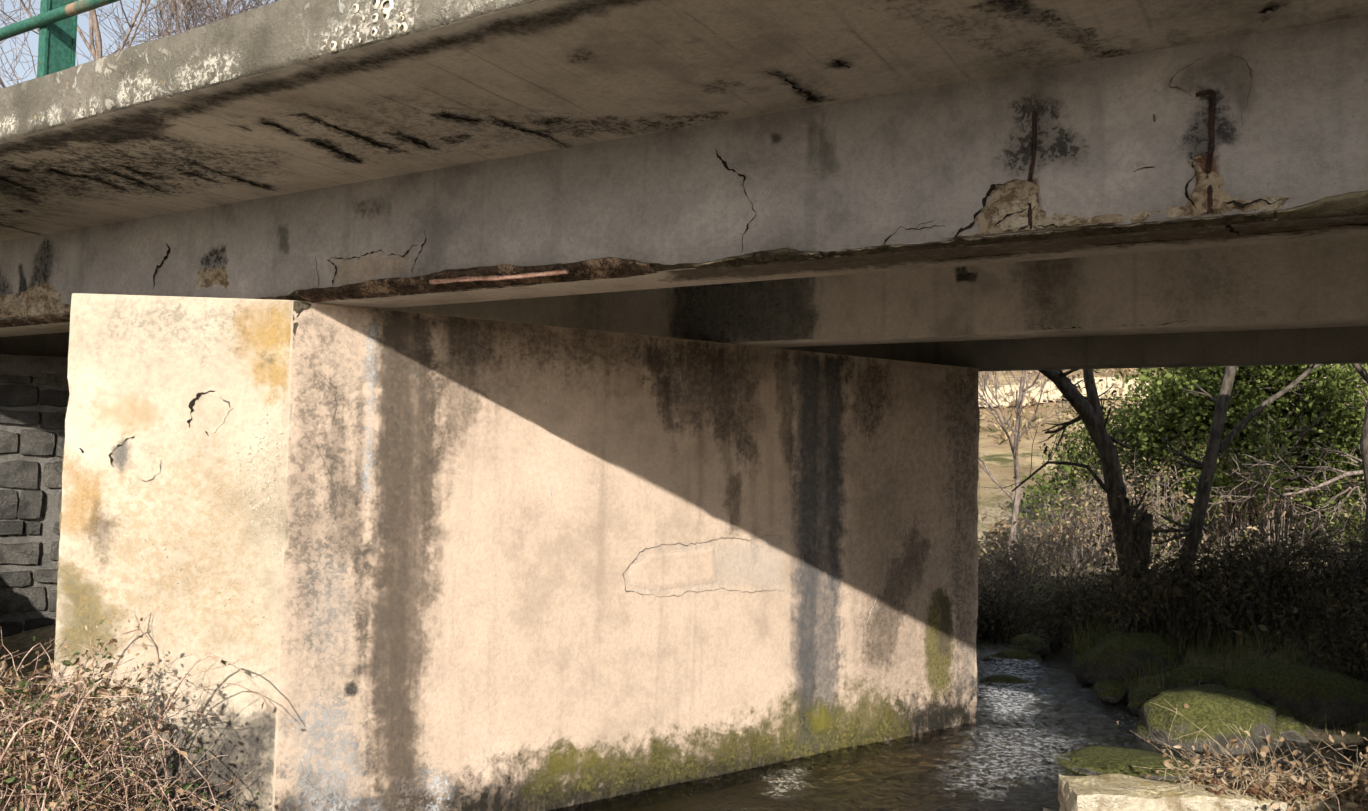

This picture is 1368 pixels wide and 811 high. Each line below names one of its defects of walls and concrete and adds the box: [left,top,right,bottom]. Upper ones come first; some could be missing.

water stain [0,0,641,161]
water stain [569,112,727,136]
crack [710,149,756,250]
spalling [690,89,1368,269]
rust [998,98,1085,218]
rust [1169,55,1253,172]
spalling [0,281,71,328]
crack [153,242,170,288]
spalling [194,247,229,290]
crack [316,233,426,286]
spalling [259,257,658,336]
water stain [139,213,1368,811]